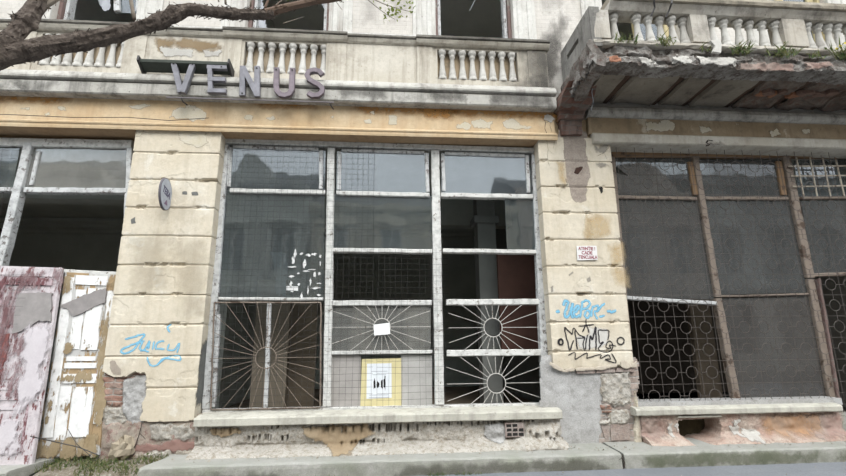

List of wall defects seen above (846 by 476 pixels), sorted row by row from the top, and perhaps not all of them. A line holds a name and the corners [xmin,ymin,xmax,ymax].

flaking render [159,46,194,57]
flaking render [672,54,794,71]
peeling [456,118,493,130]
peeling [503,118,531,130]
peeling [558,130,591,203]
flaking render [539,355,679,444]
flaking render [94,361,203,459]
flaking render [210,427,241,438]
flaking render [302,423,374,457]